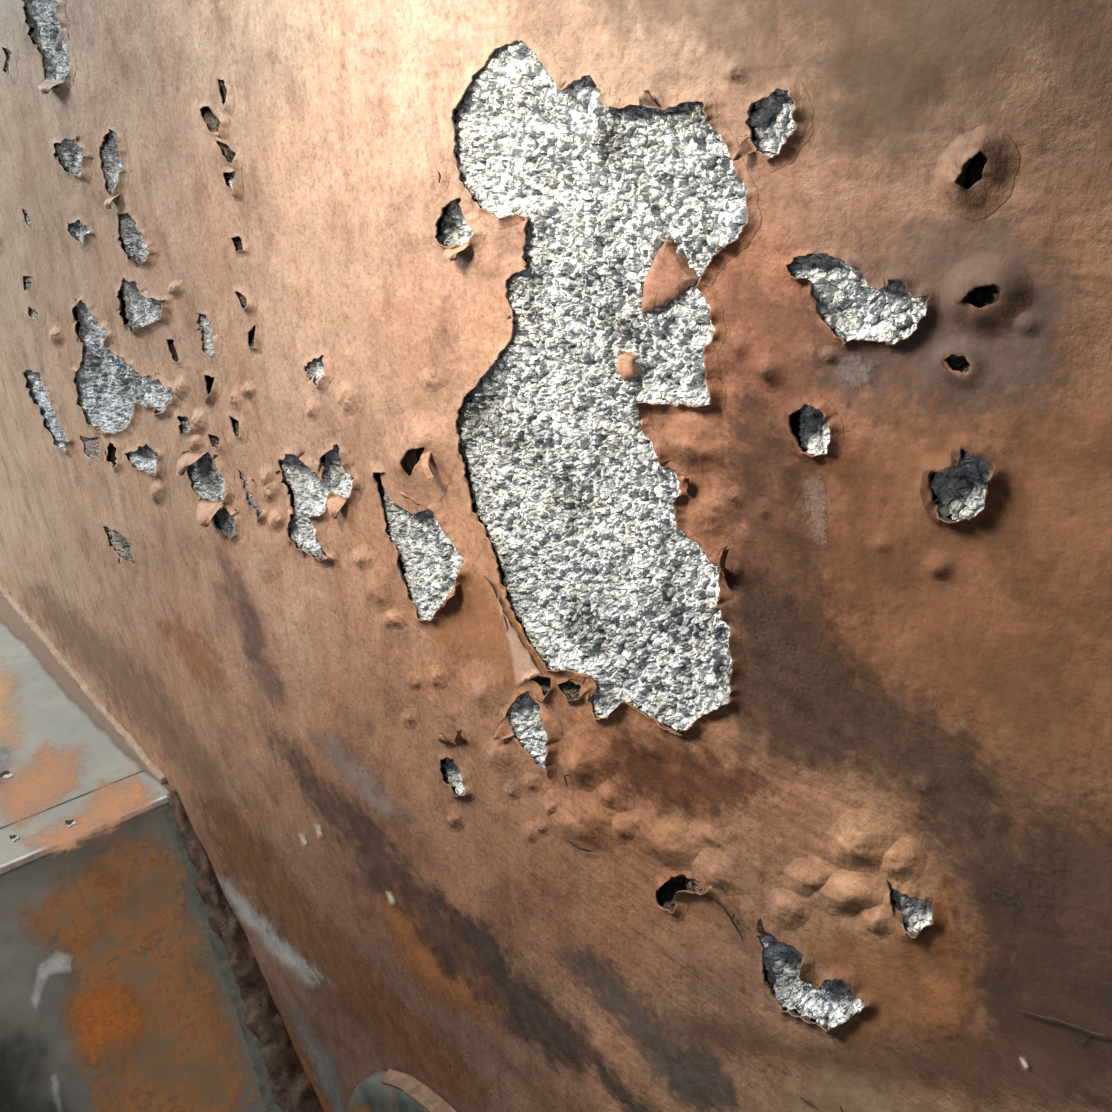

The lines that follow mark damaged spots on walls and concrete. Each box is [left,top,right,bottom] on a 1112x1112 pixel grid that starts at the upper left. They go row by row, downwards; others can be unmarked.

spalling [0,0,77,94]
spalling [16,122,269,546]
spalling [779,242,932,354]
spalling [272,31,814,784]
spalling [917,431,1011,533]
corrosion [73,985,142,1073]
damp [219,877,332,988]
damp [268,732,655,1112]
spalling [648,869,719,921]
spalling [748,918,874,1038]
damp [558,575,1112,1112]
spalling [876,870,947,944]